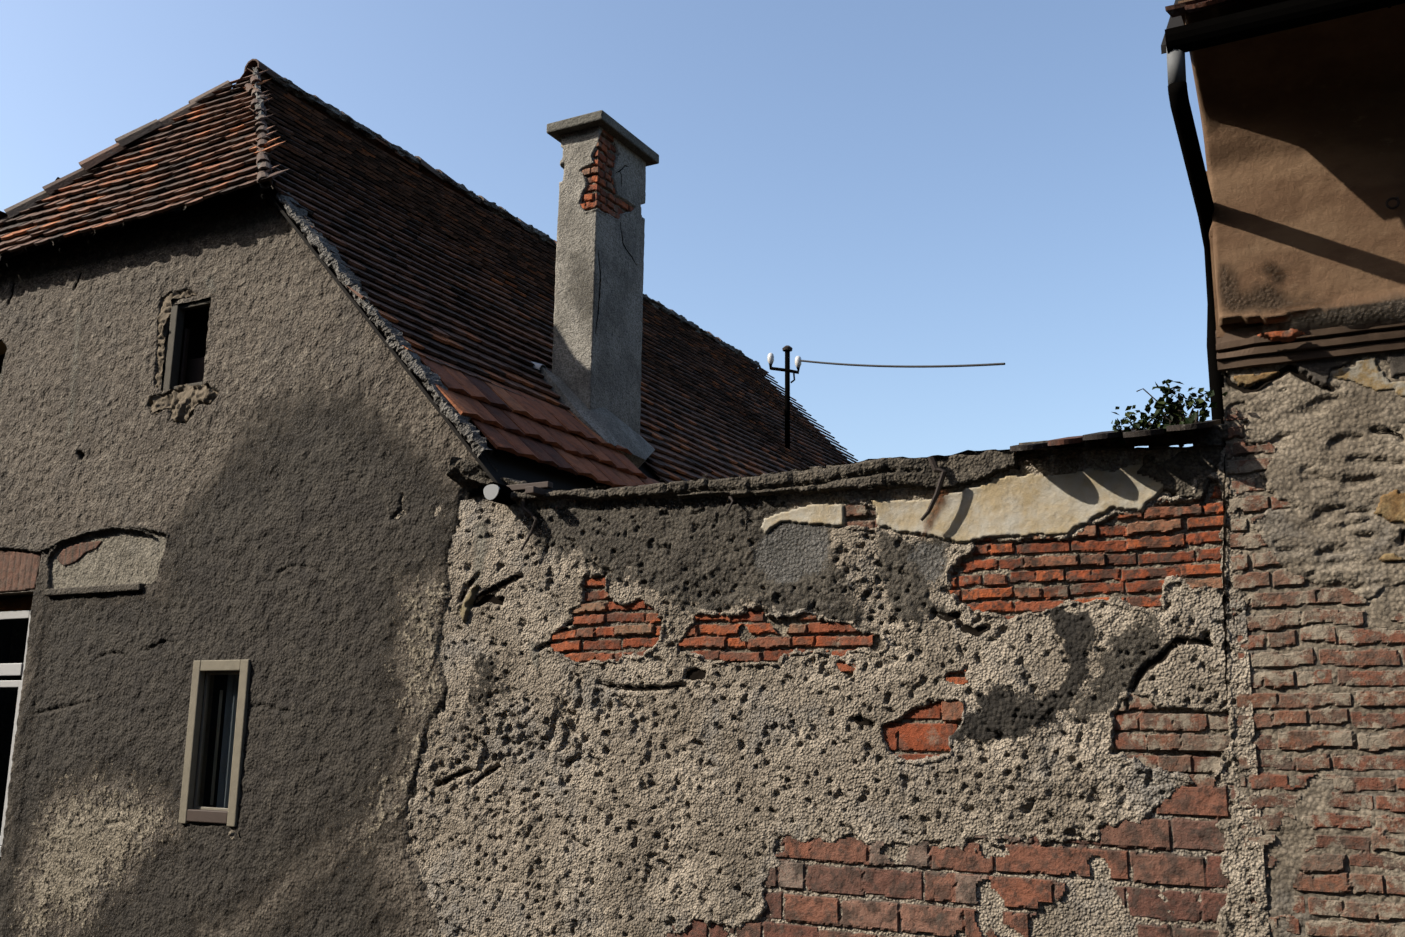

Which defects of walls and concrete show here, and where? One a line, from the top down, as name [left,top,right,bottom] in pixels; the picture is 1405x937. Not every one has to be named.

flaking render [577,129,636,221]
flaking render [148,290,219,424]
flaking render [1257,328,1304,342]
flaking render [548,571,893,677]
flaking render [666,350,1405,937]
flaking render [8,747,192,937]